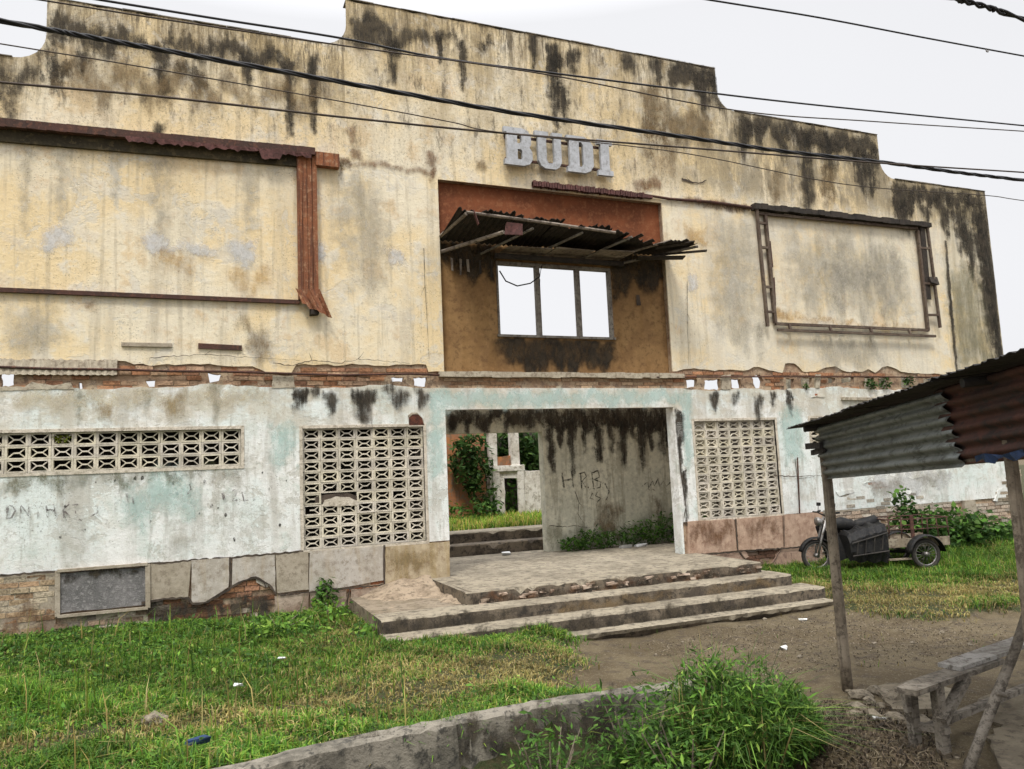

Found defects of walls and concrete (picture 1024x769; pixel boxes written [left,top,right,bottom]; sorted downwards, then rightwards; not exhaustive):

damp [0,10,326,135]
damp [528,35,581,133]
damp [642,58,723,160]
damp [891,182,1003,369]
spalling [0,365,206,391]
spalling [221,367,524,388]
damp [351,382,429,423]
damp [496,338,615,373]
spalling [537,371,743,465]
spalling [765,372,893,398]
damp [447,408,688,526]
spalling [0,573,276,635]